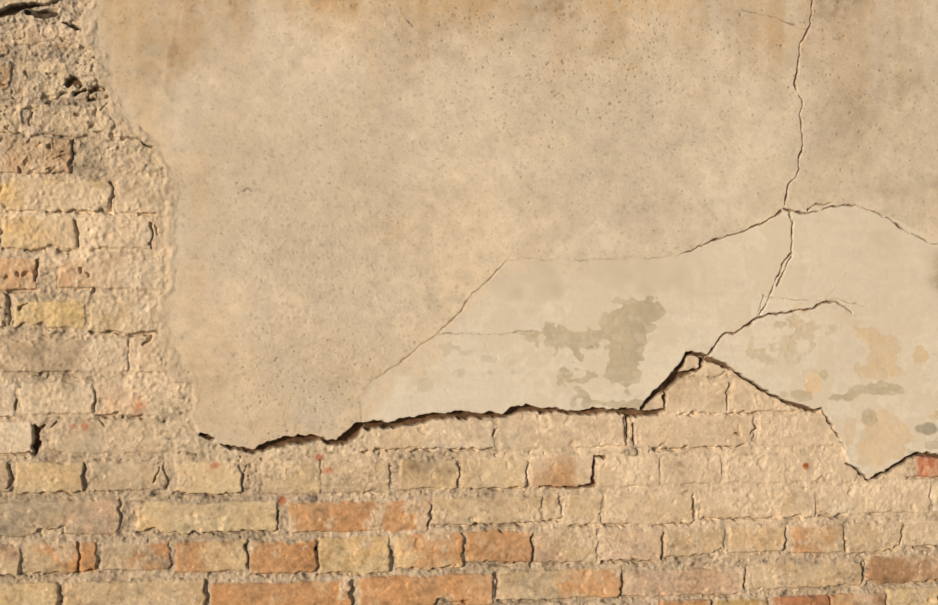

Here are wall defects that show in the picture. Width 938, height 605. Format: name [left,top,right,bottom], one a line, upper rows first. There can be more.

spalling [74,0,201,426]
crack [199,0,938,481]
peeling [515,295,667,410]
peeling [745,296,935,403]
crack [539,455,607,489]
peeling [842,407,938,468]